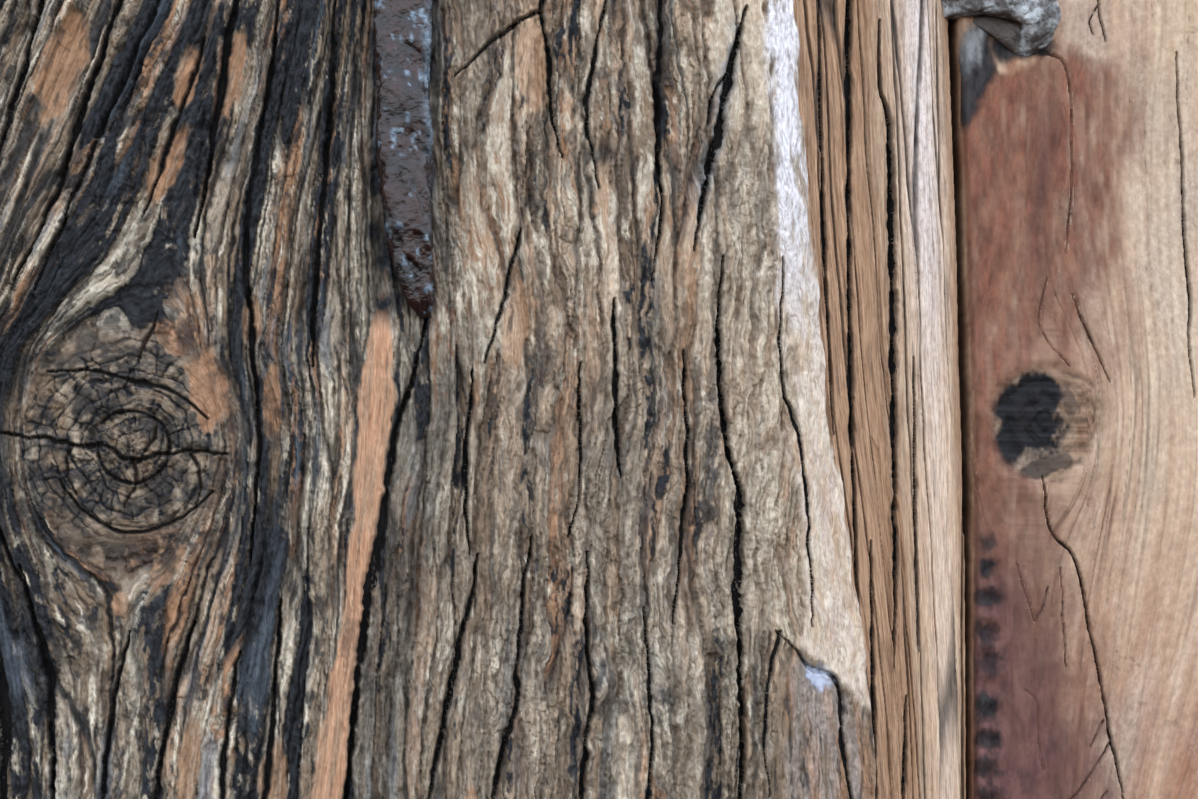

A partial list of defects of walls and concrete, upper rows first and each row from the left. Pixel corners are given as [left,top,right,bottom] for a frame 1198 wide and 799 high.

crack [12,0,160,290]
crack [142,0,240,236]
crack [693,9,745,248]
crack [0,527,57,799]
crack [0,312,229,533]
crack [101,632,130,799]
crack [219,651,241,799]
crack [242,1,279,564]
crack [262,599,282,799]
crack [642,351,689,799]
crack [714,256,745,799]
crack [817,0,918,796]